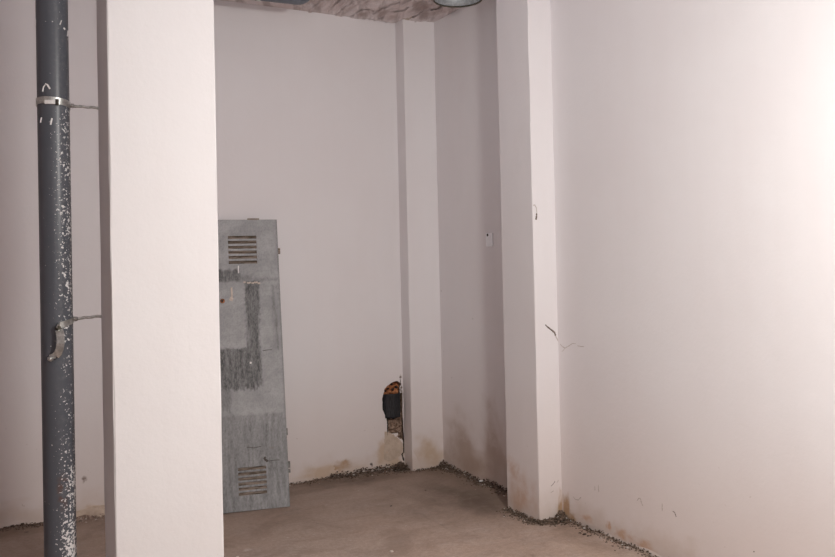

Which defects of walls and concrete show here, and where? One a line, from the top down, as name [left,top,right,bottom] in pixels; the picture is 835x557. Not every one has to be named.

spalling [383,375,403,394]
spalling [384,413,404,461]
water stain [289,383,539,519]
water stain [529,536,626,557]